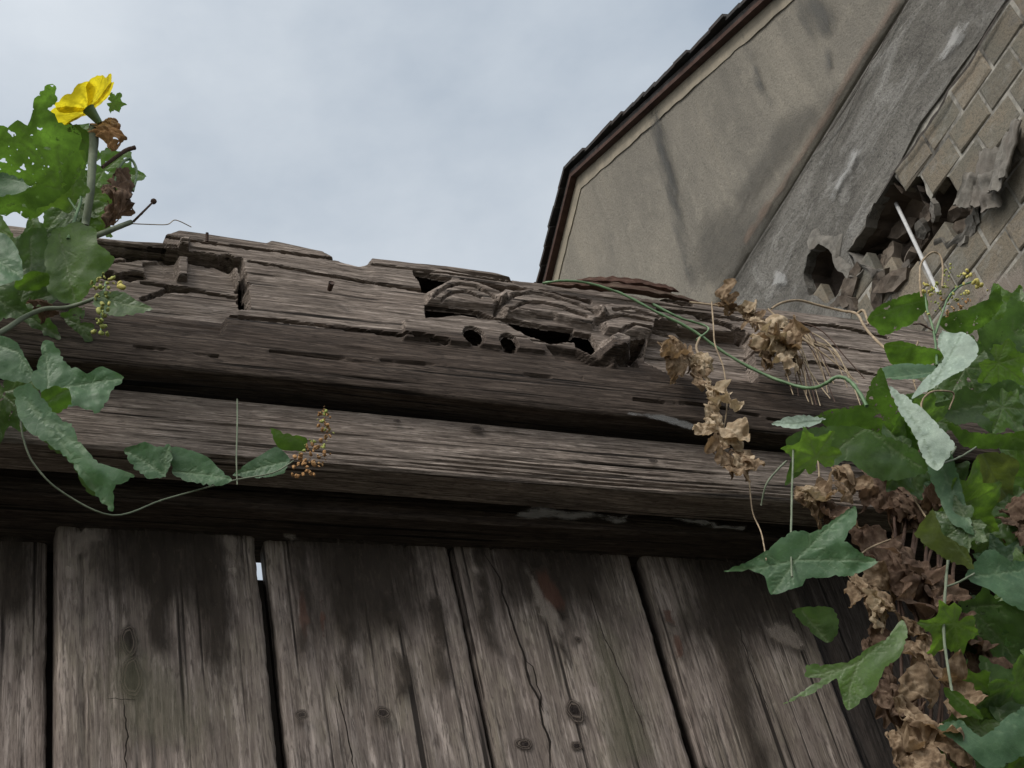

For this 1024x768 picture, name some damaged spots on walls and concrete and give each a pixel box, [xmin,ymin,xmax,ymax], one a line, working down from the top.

spalling [807,179,980,311]
peeling [976,264,1024,302]
crack [483,549,551,767]